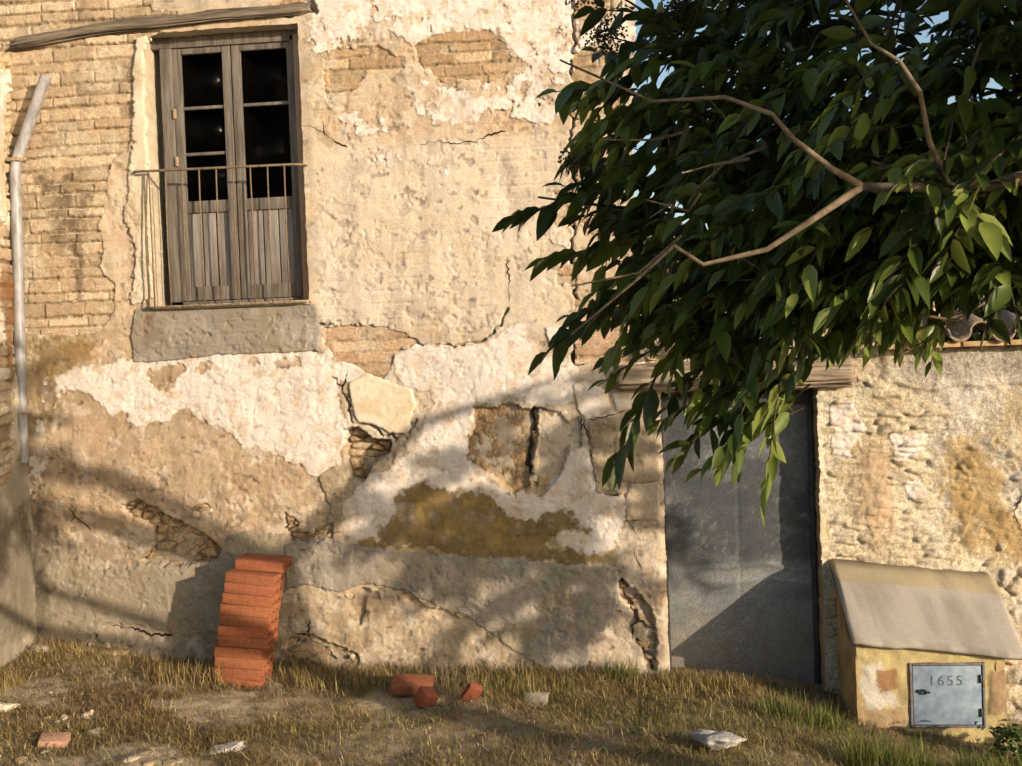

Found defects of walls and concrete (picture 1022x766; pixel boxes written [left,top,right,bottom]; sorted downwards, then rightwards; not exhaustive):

peeling [279,0,637,127]
peeling [337,106,388,137]
crack [569,114,609,182]
flaking render [0,0,177,487]
peeling [549,190,598,247]
crack [461,257,511,346]
flaking render [557,264,589,321]
crack [571,345,588,366]
peeling [28,321,631,564]
crack [525,407,537,474]
water stain [359,482,602,565]
crack [621,520,654,669]